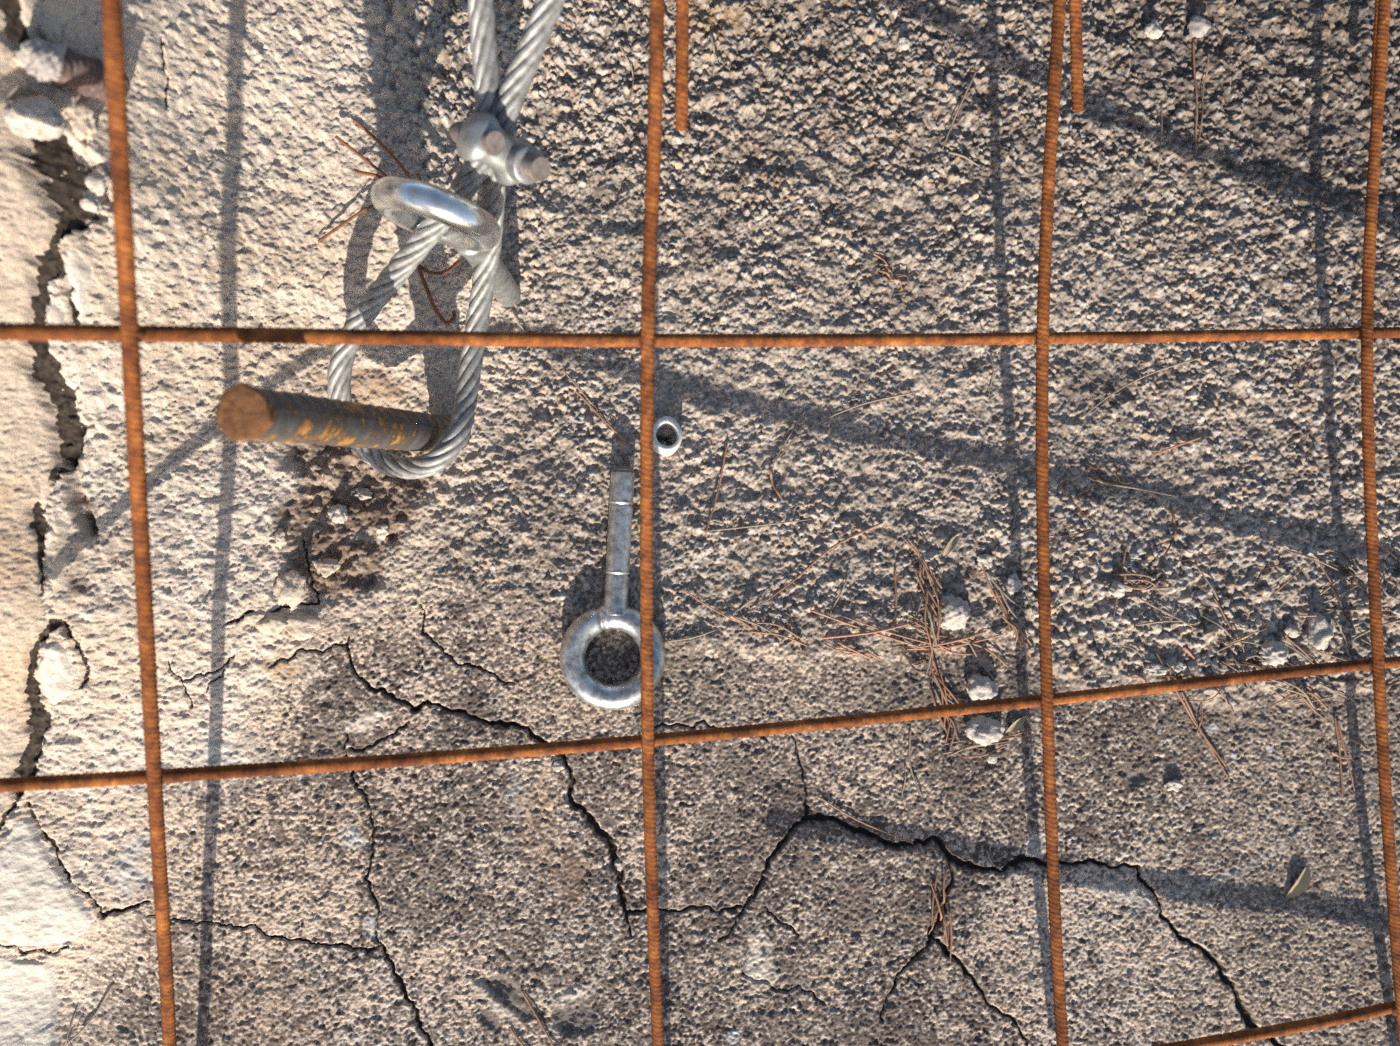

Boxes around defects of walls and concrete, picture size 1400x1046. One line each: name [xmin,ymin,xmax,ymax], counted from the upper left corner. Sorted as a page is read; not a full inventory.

spalling [2,96,67,141]
crack [19,135,107,592]
flaking render [45,248,97,325]
flaking render [37,641,87,705]
crack [168,540,320,706]
crack [420,604,512,683]
corrosion [0,0,1035,1046]
corrosion [654,0,1400,1046]
flaking render [0,810,95,1046]
crack [0,620,1286,1046]